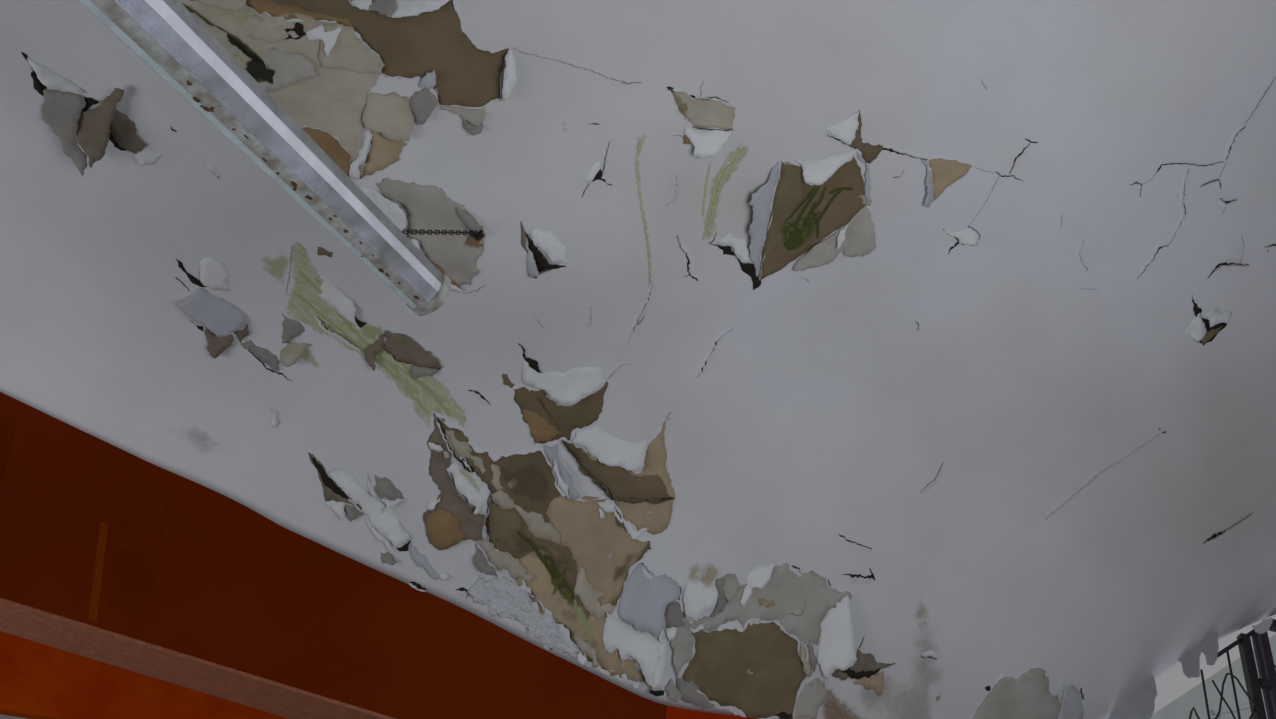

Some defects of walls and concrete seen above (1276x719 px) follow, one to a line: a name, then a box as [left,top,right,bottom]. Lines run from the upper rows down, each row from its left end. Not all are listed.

peeling [21,52,164,176]
peeling [245,0,516,294]
peeling [520,221,569,278]
peeling [667,85,737,159]
peeling [710,110,974,290]
crack [1132,77,1276,280]
peeling [176,255,312,382]
peeling [318,275,442,379]
peeling [1185,297,1232,346]
peeling [308,343,896,719]
crack [1203,513,1253,546]
peeling [970,665,1084,719]